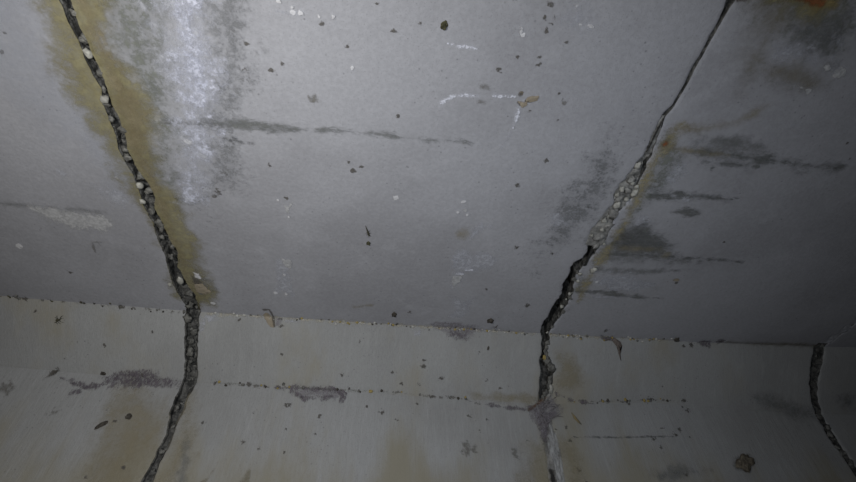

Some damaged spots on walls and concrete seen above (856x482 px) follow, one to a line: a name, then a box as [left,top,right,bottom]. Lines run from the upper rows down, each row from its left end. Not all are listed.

crack [69,6,200,482]
leakage [105,0,245,203]
crack [538,0,729,482]
leakage [611,140,699,257]
crack [811,397,856,476]